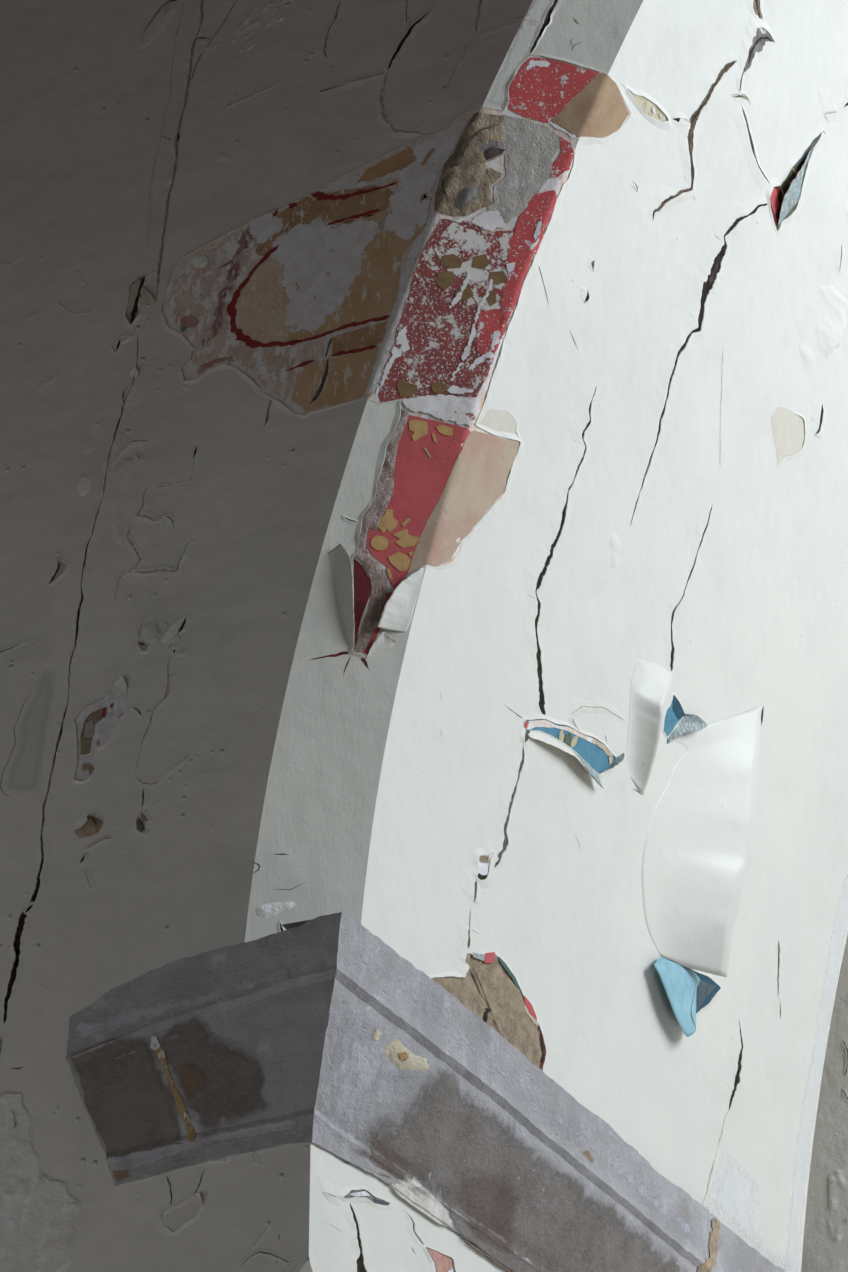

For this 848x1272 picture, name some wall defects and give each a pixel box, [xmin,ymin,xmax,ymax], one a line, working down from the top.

flaking render [550,73,673,138]
peeling [248,119,469,334]
crack [627,0,775,528]
crack [0,334,144,1069]
flaking render [366,409,521,659]
crack [455,381,626,950]
crack [661,502,713,672]
peeling [519,660,762,1037]
water stain [71,969,296,1175]
water stain [326,1019,396,1136]
flaking render [425,946,548,1075]
water stain [359,1073,679,1272]